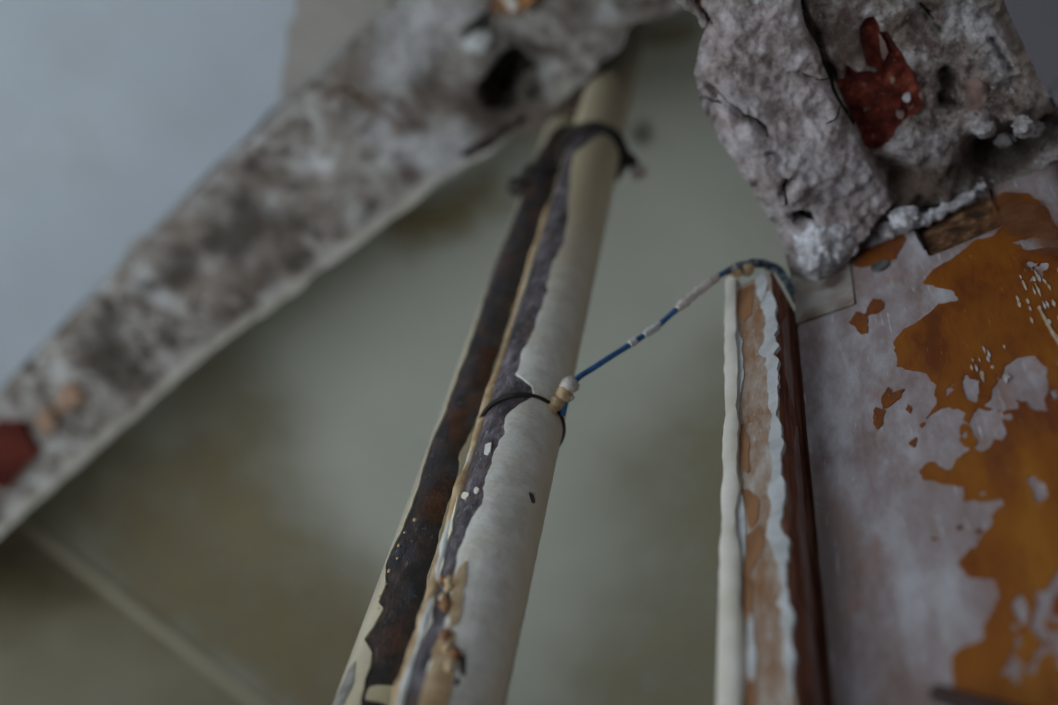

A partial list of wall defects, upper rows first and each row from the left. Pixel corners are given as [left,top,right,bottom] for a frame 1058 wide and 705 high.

crack [797,0,855,126]
flaking render [837,17,924,149]
spalling [939,66,958,107]
peeling [992,192,1058,231]
peeling [853,234,906,268]
peeling [849,298,884,334]
peeling [873,387,912,430]
peeling [893,227,1058,705]
corrosion [420,481,455,520]
corrosion [438,575,454,613]
corrosion [439,629,461,672]